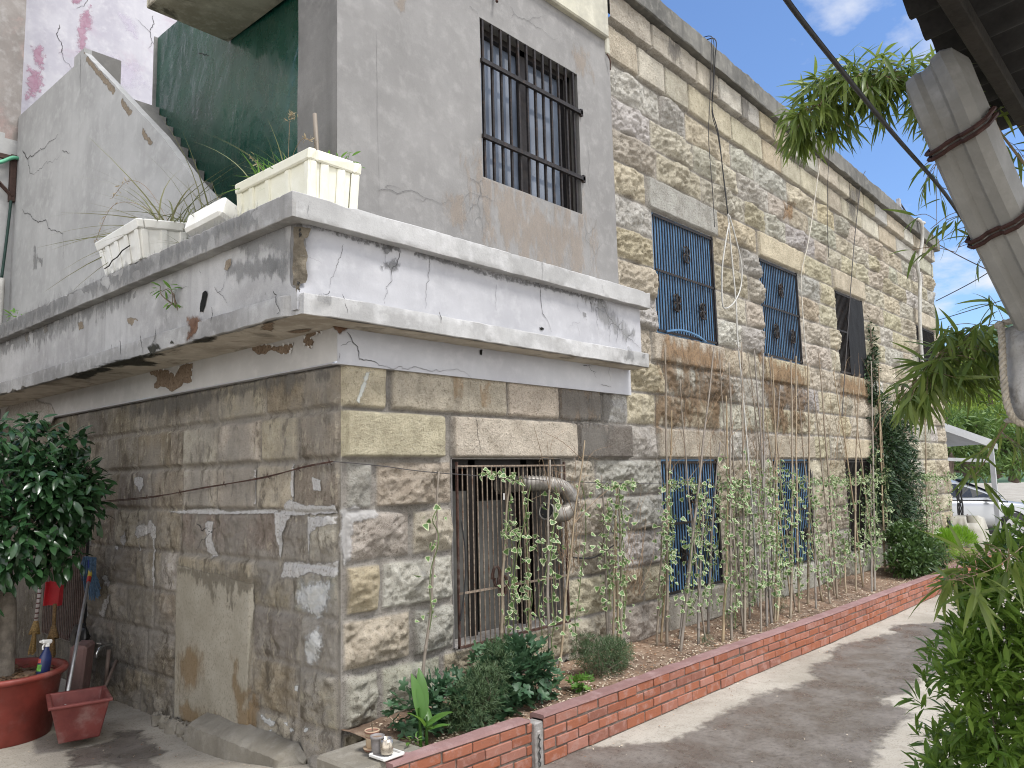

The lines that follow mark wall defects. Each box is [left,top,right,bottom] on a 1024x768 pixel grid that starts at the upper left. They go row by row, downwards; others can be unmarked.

peeling [25,45,44,99]
crack [378,179,496,233]
spalling [292,227,311,292]
water stain [414,252,605,302]
crack [303,246,485,383]
peeling [252,329,323,355]
peeling [150,362,193,392]
peeling [296,580,330,664]